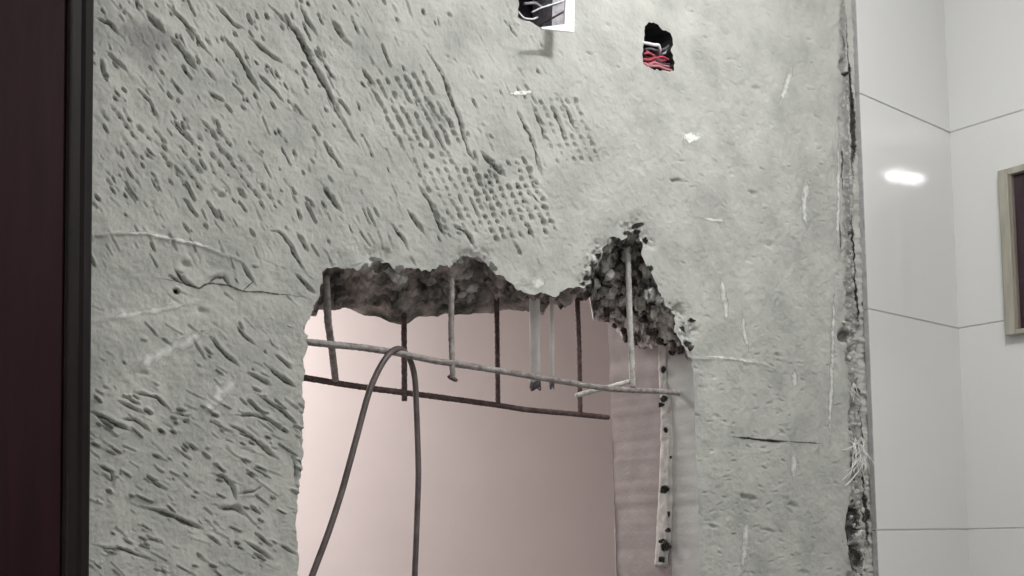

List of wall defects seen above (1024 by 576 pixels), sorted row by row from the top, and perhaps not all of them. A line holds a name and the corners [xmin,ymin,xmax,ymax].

crack [841,18,857,190]
crack [166,272,289,295]
spalling [304,222,696,420]
crack [838,220,860,352]
crack [732,436,820,444]